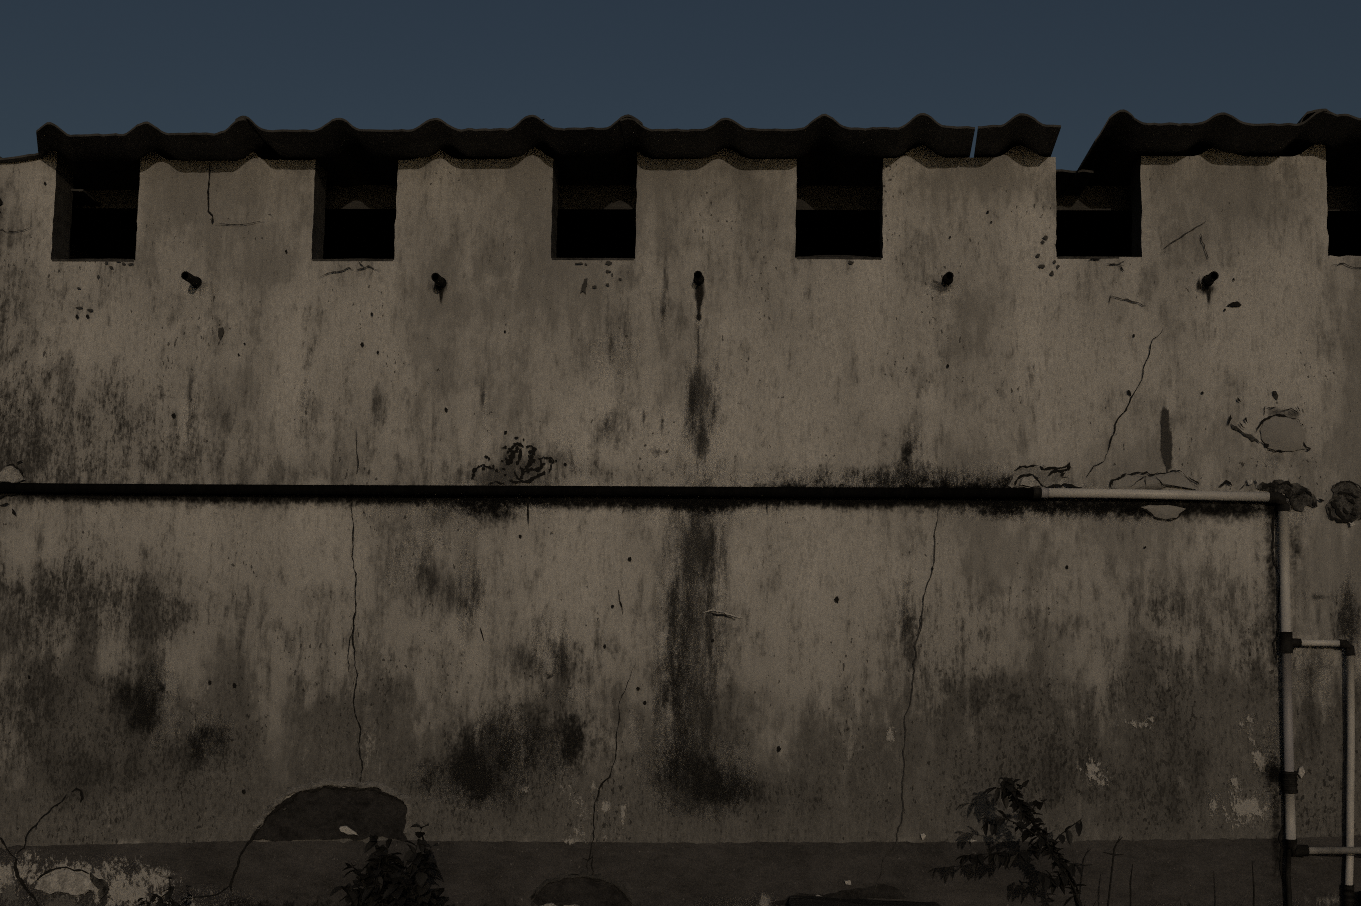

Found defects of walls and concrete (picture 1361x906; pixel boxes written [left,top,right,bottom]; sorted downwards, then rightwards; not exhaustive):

crack [1165,221,1208,257]
leakage [695,283,704,346]
crack [1087,258,1162,476]
leakage [689,368,715,456]
spalling [471,431,567,486]
leakage [902,442,912,466]
crack [347,439,363,782]
leakage [0,466,1293,806]
peeling [250,777,416,841]
crack [0,792,68,906]
peeling [0,851,216,906]